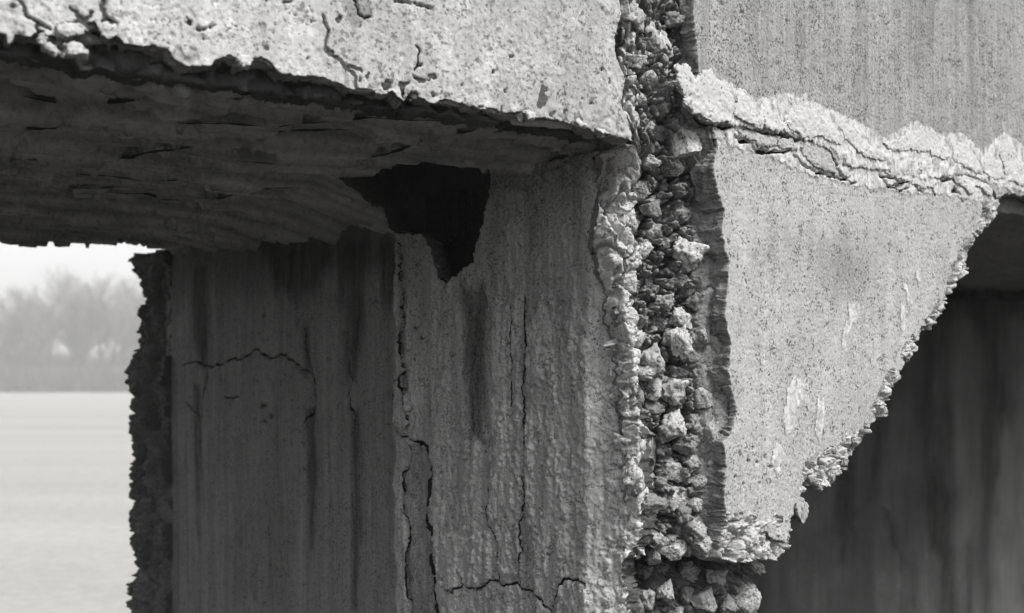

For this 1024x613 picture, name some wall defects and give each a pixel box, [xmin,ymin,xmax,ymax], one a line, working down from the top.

crack [693,117,814,155]
crack [879,177,957,193]
spalling [587,0,1024,613]
crack [185,345,317,422]
crack [393,240,585,613]